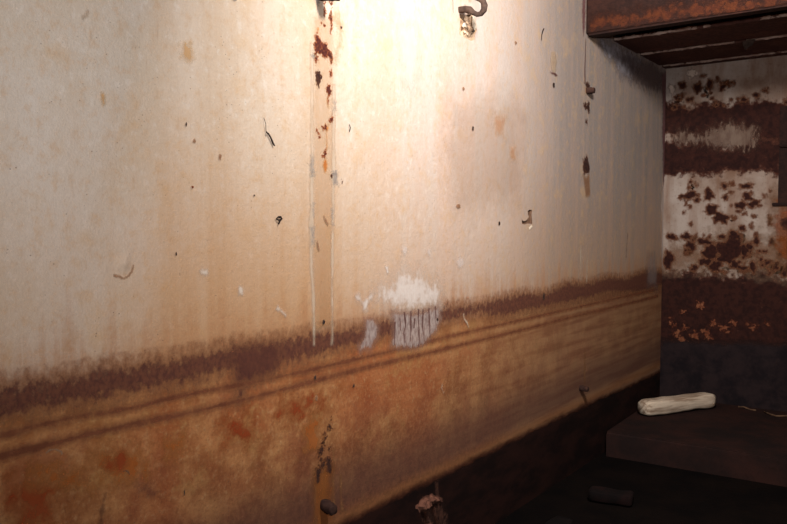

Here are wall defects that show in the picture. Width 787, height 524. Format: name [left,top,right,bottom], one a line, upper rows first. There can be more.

rust [589,0,787,32]
rust [661,74,787,344]
water stain [0,266,662,461]
spalling [415,493,448,524]